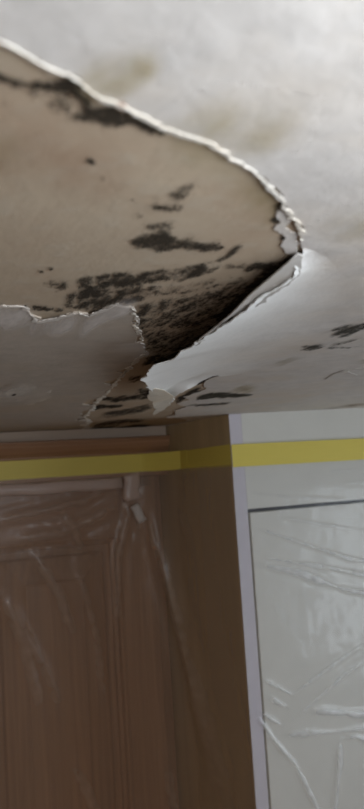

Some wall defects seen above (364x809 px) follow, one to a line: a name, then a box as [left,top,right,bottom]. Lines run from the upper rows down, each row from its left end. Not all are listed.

leakage [0,74,166,137]
leakage [153,183,194,212]
peeling [0,38,348,429]
leakage [0,222,302,365]
leakage [301,324,364,351]
leakage [91,375,152,429]
leakage [174,387,253,407]